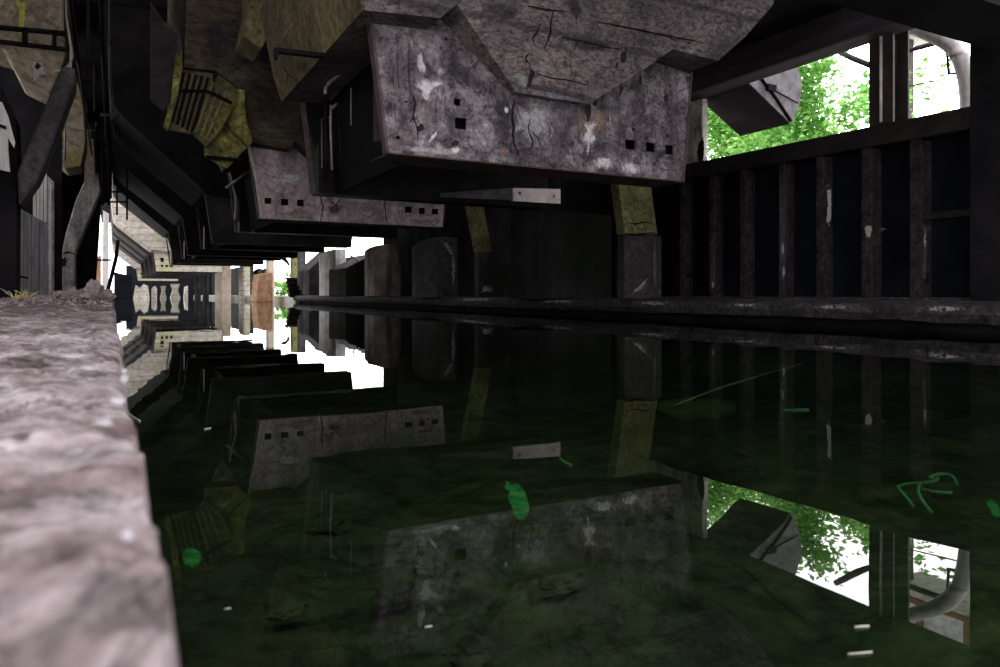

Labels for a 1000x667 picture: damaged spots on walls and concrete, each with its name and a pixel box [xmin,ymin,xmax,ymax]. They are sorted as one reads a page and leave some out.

crack [525,6,704,86]
crack [510,100,551,156]
crack [626,221,657,236]